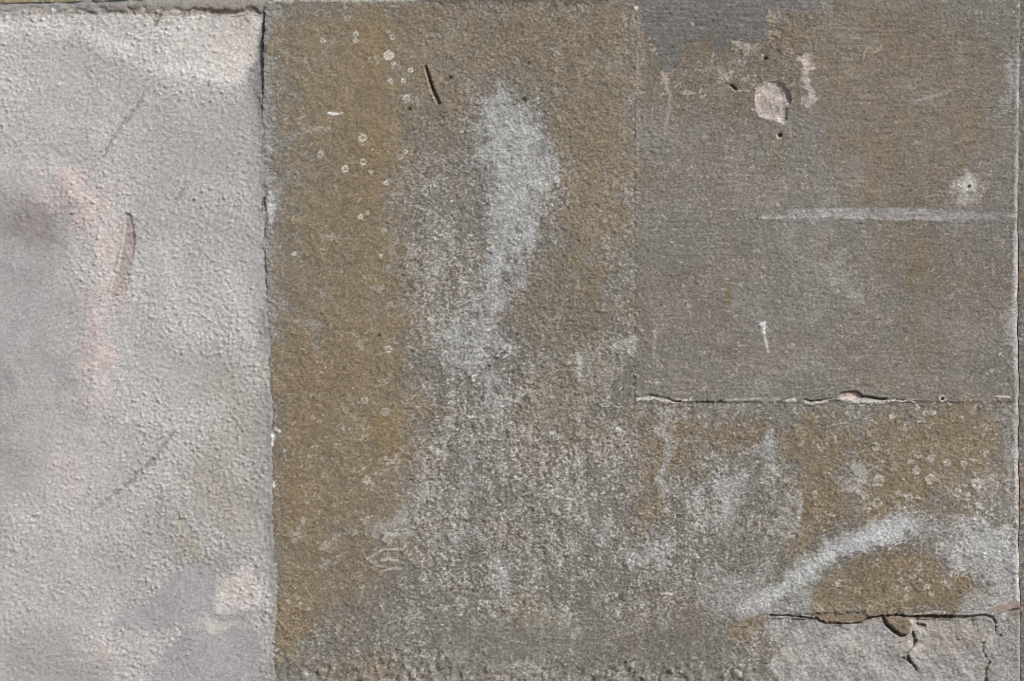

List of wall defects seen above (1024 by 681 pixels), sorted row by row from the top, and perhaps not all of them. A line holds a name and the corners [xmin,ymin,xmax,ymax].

peeling [630,0,855,140]
crack [632,7,642,220]
leakage [263,0,1020,681]
crack [631,353,1013,419]
spalling [838,389,864,400]
crack [808,609,956,672]
crack [980,608,1020,681]